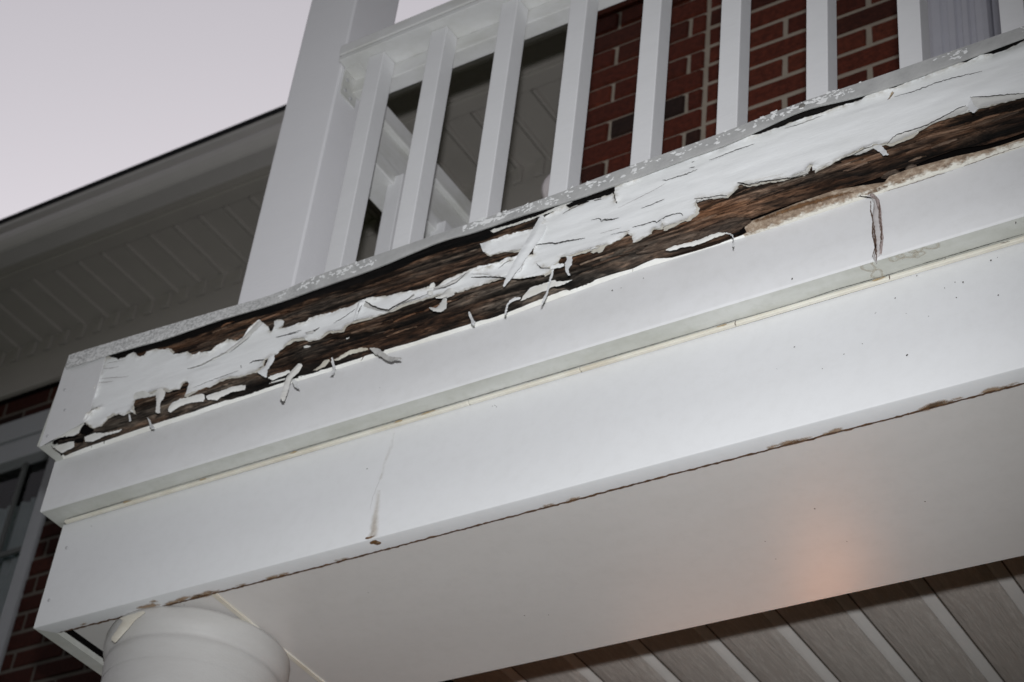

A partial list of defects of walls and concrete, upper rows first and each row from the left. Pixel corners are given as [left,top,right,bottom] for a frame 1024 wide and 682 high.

peeling [54,27,1024,459]
crack [68,144,1022,519]
crack [841,71,1024,159]